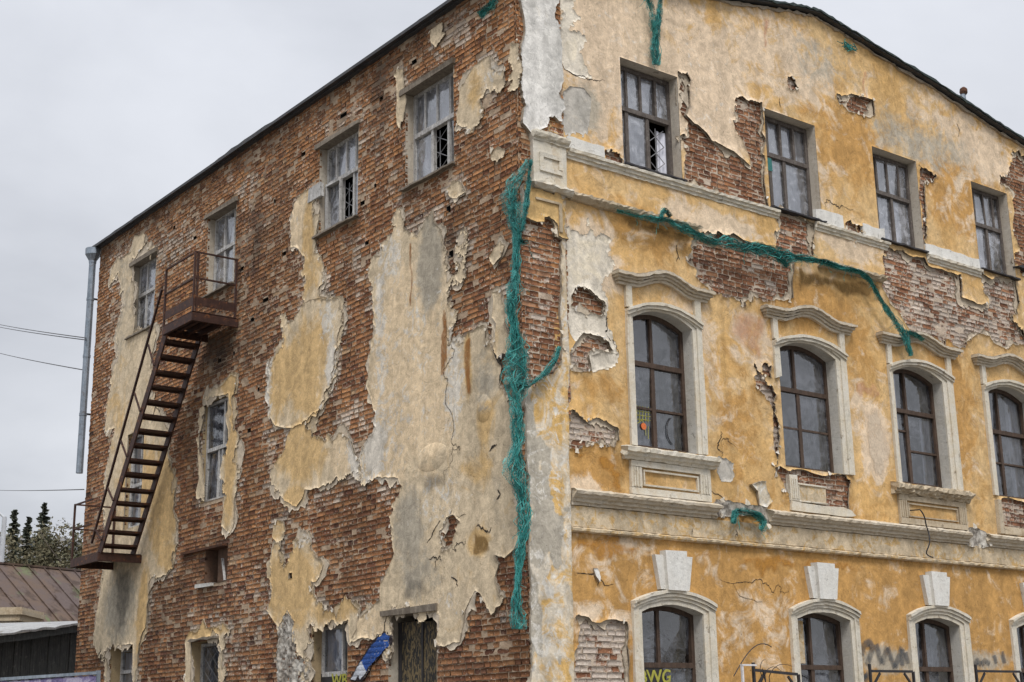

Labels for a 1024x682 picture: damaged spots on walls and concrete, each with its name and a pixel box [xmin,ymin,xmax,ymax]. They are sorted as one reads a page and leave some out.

flaking render [836,93,876,118]
flaking render [674,72,815,307]
flaking render [882,151,1024,349]
flaking render [258,180,619,682]
flaking render [739,363,850,518]
crack [427,514,491,586]
flaking render [574,615,629,682]